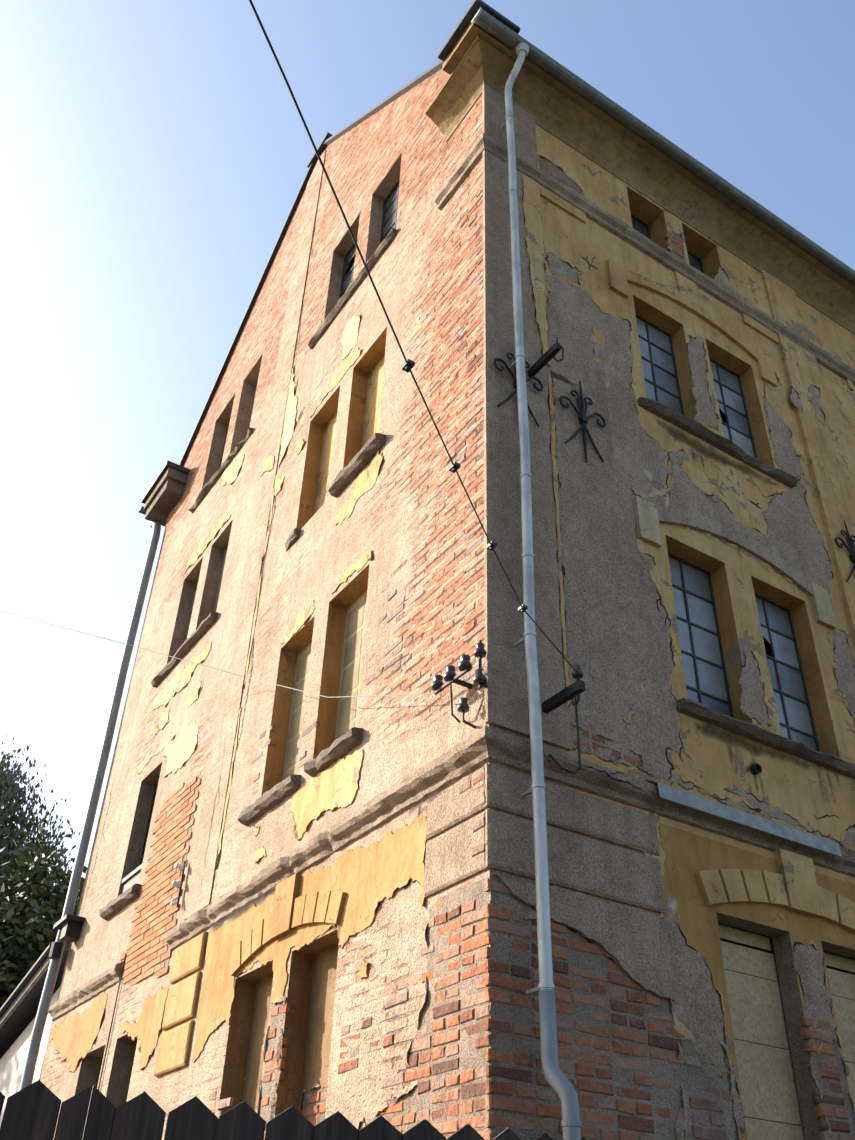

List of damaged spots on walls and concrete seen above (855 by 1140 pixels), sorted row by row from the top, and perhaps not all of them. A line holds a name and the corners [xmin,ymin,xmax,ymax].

spalling [433,174,484,514]
spalling [522,154,855,850]
spalling [366,559,412,695]
spalling [465,569,485,680]
spalling [299,721,320,768]
peeling [290,749,364,841]
peeling [50,991,107,1072]
peeling [121,986,169,1070]
spalling [192,807,745,1140]
spalling [793,940,855,1140]